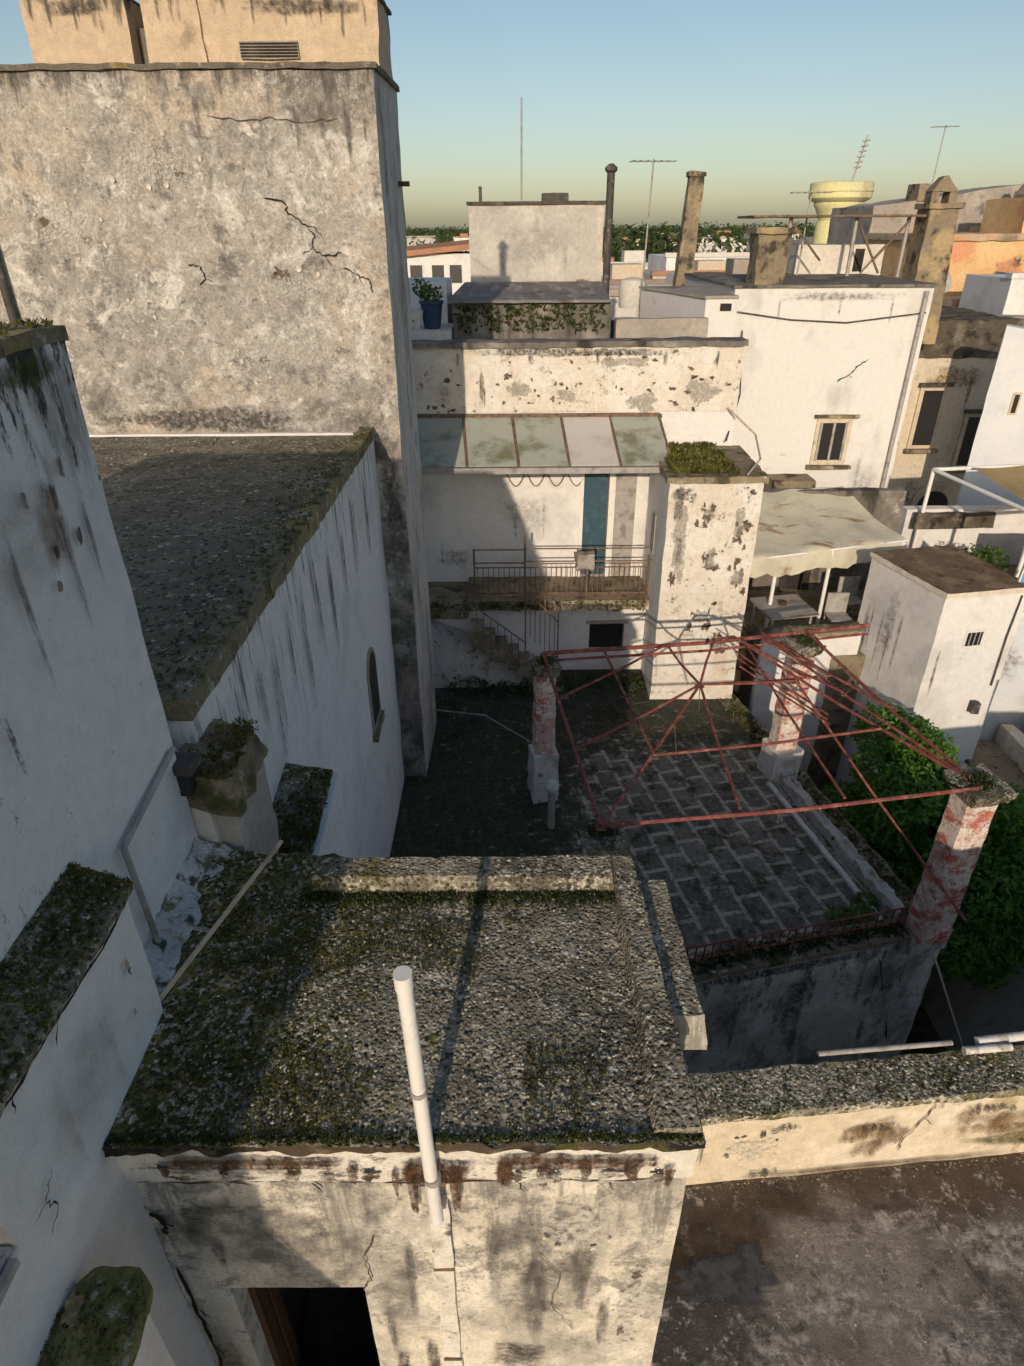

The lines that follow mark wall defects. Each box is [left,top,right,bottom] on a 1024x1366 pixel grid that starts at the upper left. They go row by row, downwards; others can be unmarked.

water stain [243,0,366,35]
crack [265,197,373,292]
peeling [496,373,582,405]
peeling [569,350,731,419]
flaking render [667,486,757,596]
peeling [685,602,726,654]
water stain [842,1122,908,1157]
water stain [960,1103,1024,1145]
corrosion [139,1159,359,1187]
corrosion [391,1164,470,1213]
corrosion [486,1157,675,1187]
water stain [667,1196,828,1289]